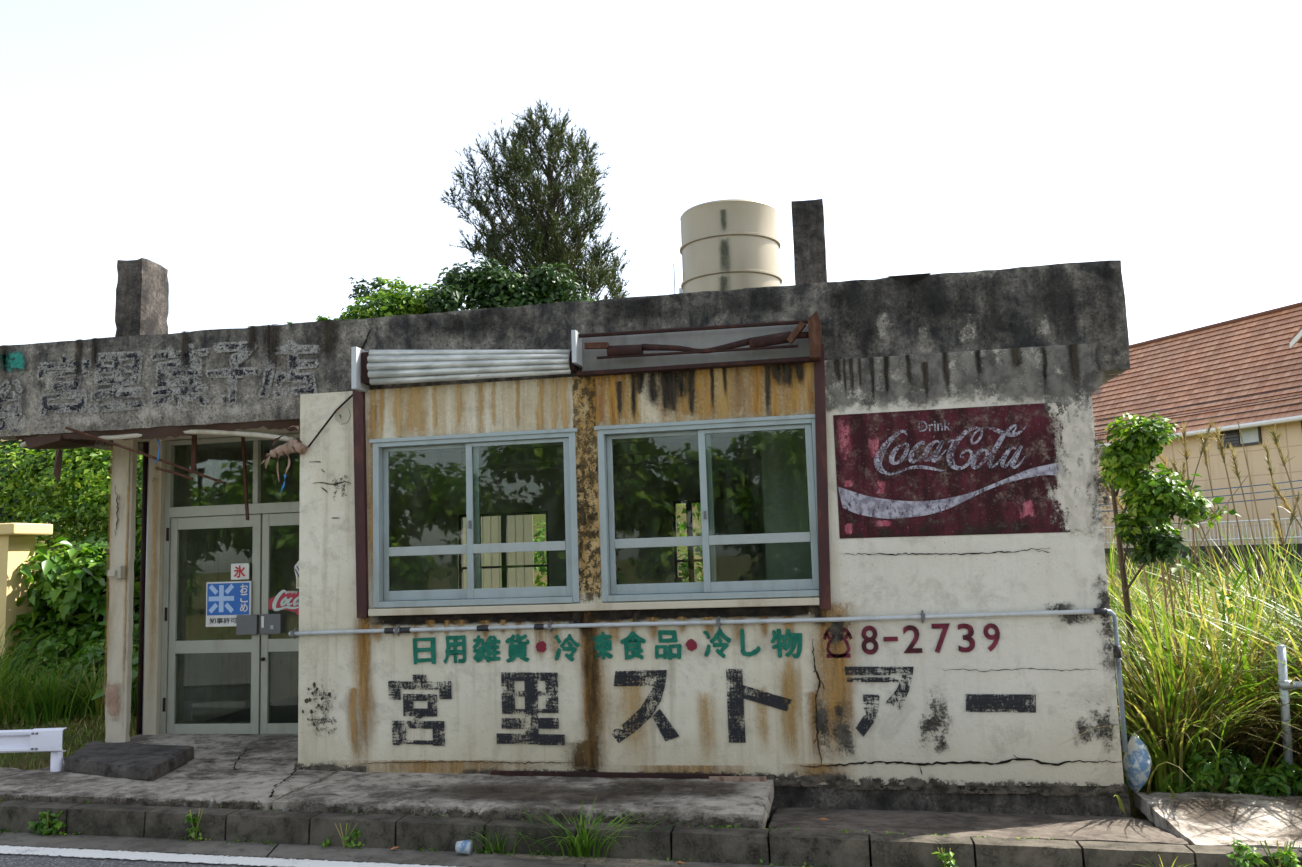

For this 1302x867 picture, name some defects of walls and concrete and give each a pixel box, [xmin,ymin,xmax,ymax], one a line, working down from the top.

damp [75,338,98,381]
damp [248,324,279,363]
damp [320,319,338,356]
damp [605,295,677,320]
rust [660,362,815,422]
damp [720,209,781,309]
damp [825,262,1118,411]
rust [368,386,436,565]
rust [537,374,639,594]
rust [349,618,395,750]
rust [783,603,850,749]
crack [800,640,1122,774]